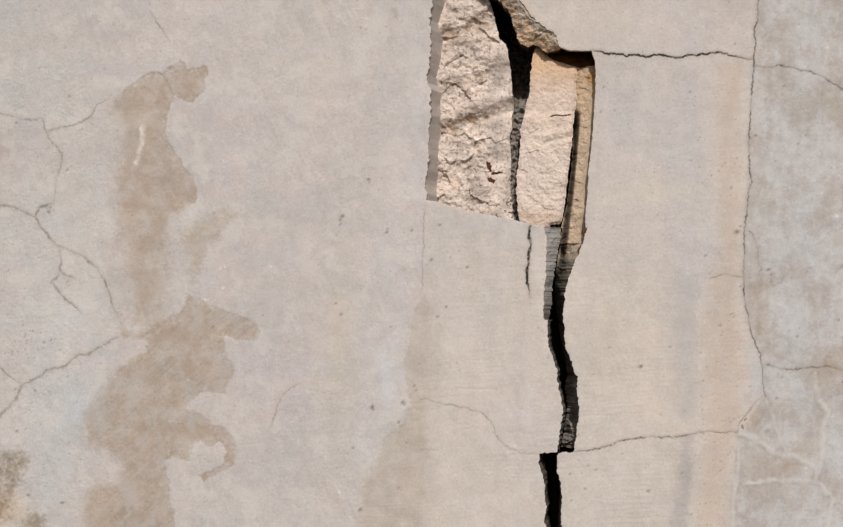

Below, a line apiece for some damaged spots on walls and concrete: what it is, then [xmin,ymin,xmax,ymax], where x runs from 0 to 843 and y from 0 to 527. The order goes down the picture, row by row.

crack [0,99,122,419]
damp [88,58,210,332]
spalling [425,0,596,244]
crack [419,0,843,527]
damp [73,478,125,527]